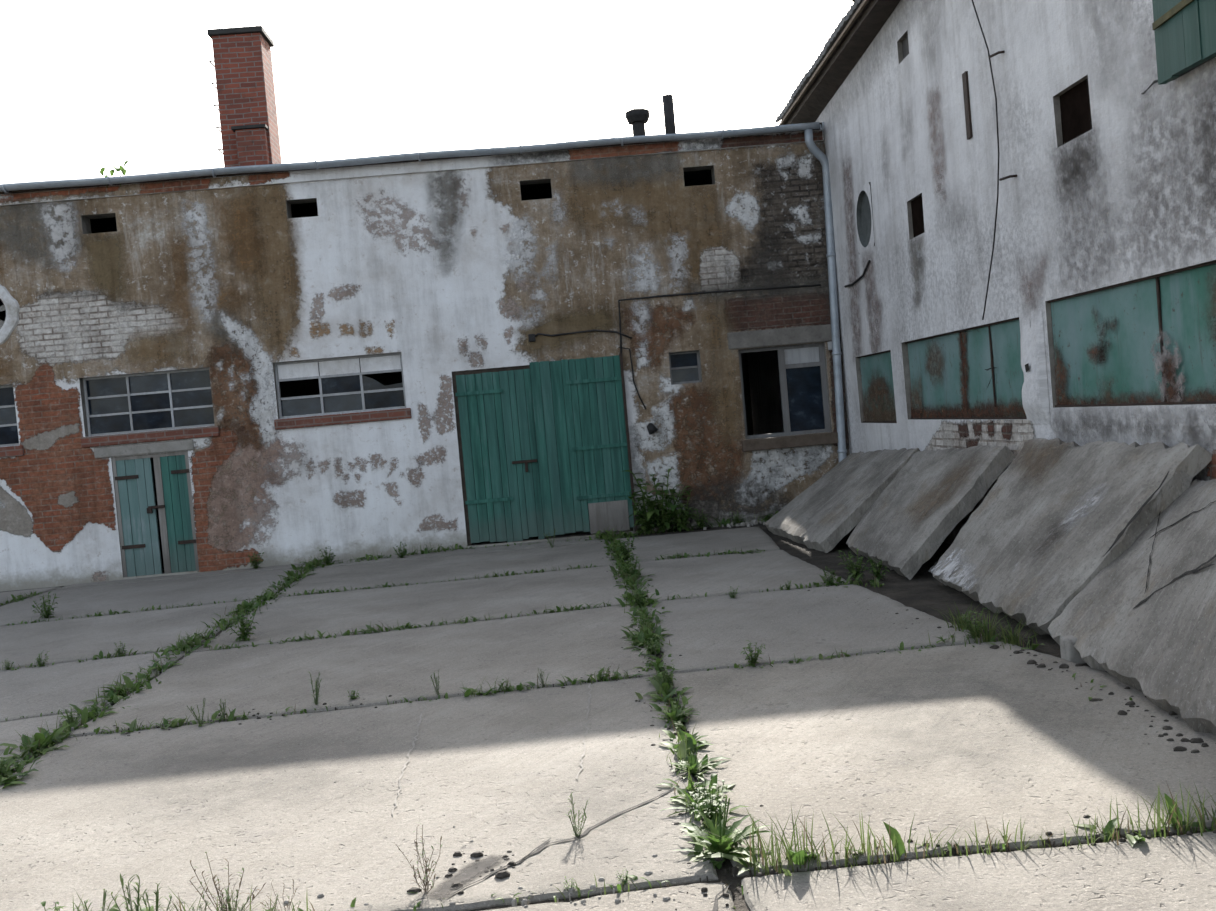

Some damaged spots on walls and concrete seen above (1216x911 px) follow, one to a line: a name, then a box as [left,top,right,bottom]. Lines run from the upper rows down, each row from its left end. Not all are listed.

damp [131,202,243,363]
peeling [0,172,457,572]
damp [429,170,459,262]
peeling [458,334,488,367]
peeling [486,131,860,515]
corrosion [863,377,896,421]
damp [910,239,922,303]
corrosion [911,331,1026,420]
damp [1060,144,1104,282]
corrosion [1054,332,1216,406]
damp [1131,88,1216,265]
crack [1103,471,1216,609]